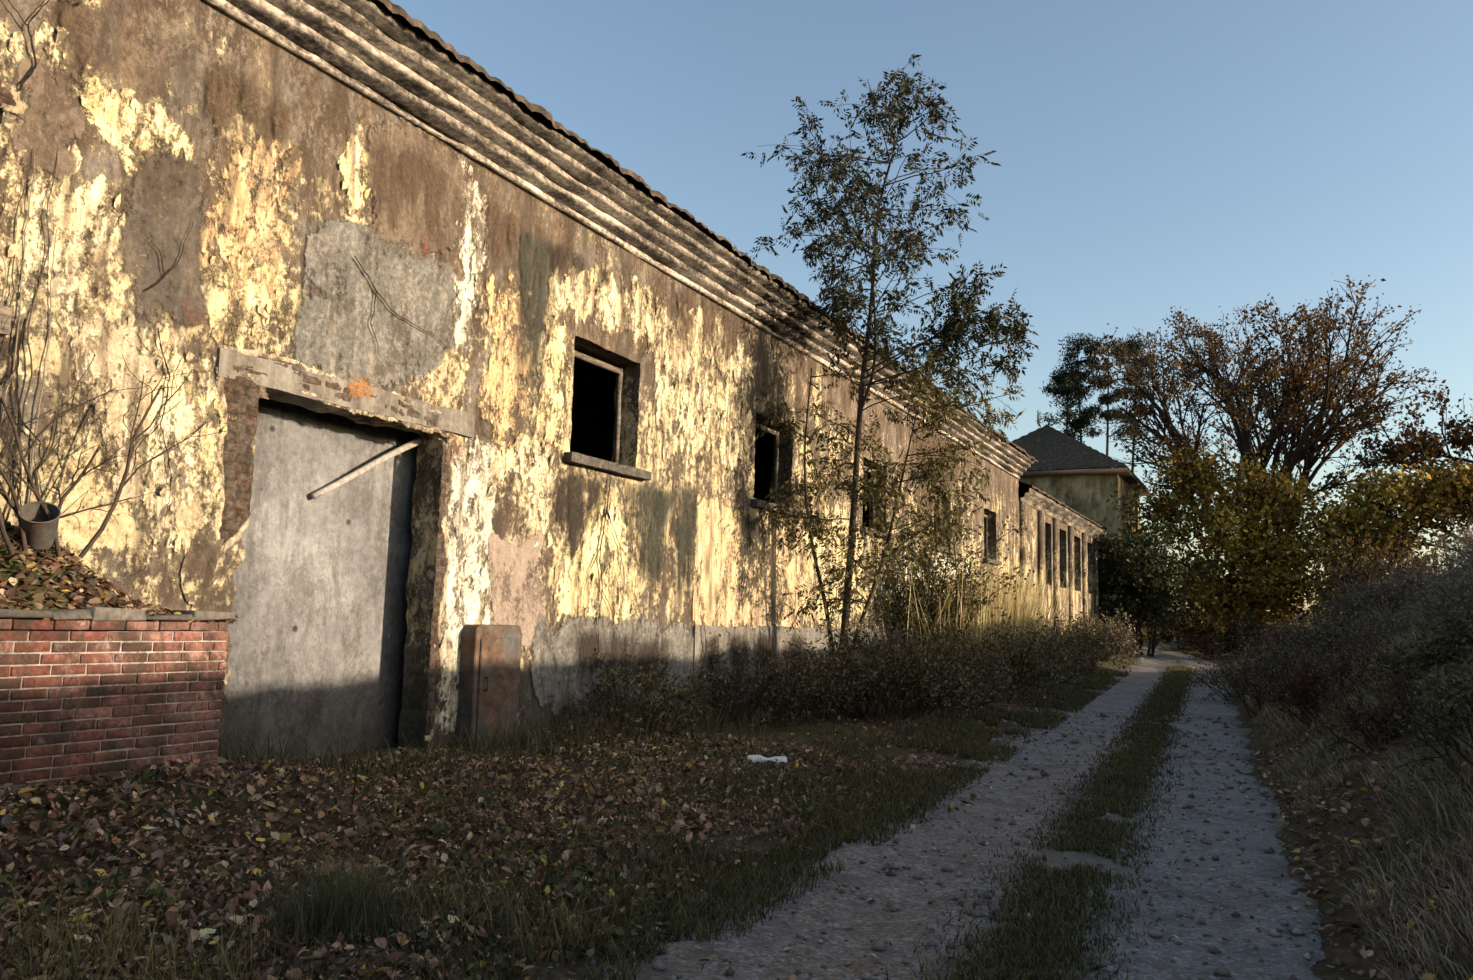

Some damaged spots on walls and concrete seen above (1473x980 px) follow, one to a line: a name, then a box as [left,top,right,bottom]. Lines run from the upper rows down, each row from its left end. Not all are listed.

flaking render [0,11,973,742]
leakage [552,473,602,565]
leakage [627,481,698,597]
leakage [579,633,669,691]
leakage [705,635,806,685]